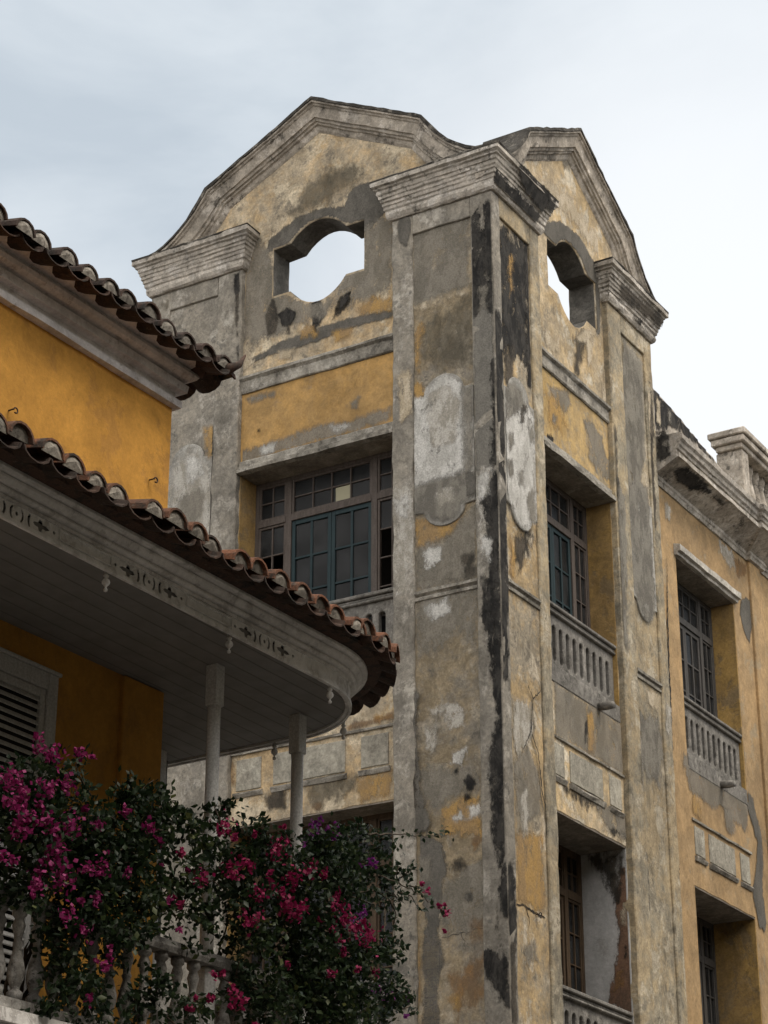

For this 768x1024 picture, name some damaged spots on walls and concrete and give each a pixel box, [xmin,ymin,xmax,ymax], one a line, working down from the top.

water stain [265,299,296,335]
water stain [311,291,351,334]
peeling [242,322,499,597]
peeling [506,408,536,530]
water stain [413,200,533,1024]
crack [521,676,547,833]
flaking render [608,868,632,1012]